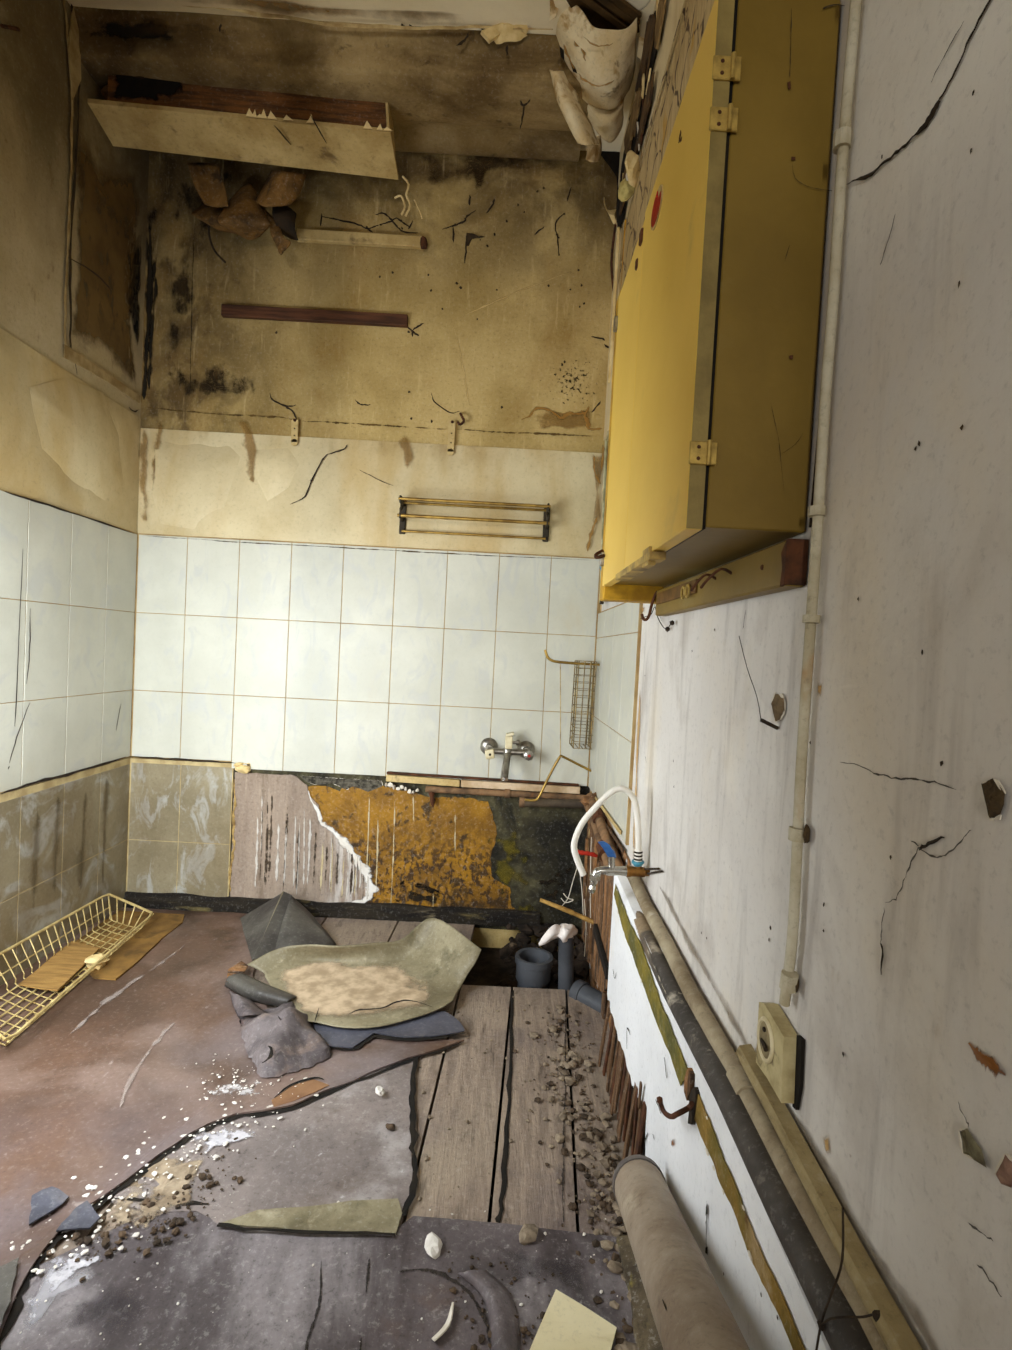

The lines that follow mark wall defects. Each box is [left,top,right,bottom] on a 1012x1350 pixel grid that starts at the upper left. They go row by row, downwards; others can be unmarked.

leakage [91,18,204,40]
leakage [235,0,345,14]
peeling [549,0,666,229]
leakage [626,0,649,10]
crack [848,0,991,184]
leakage [73,147,193,399]
leakage [178,367,253,395]
crack [129,247,601,504]
peeling [230,762,516,910]
crack [841,762,954,789]
crack [880,830,971,975]